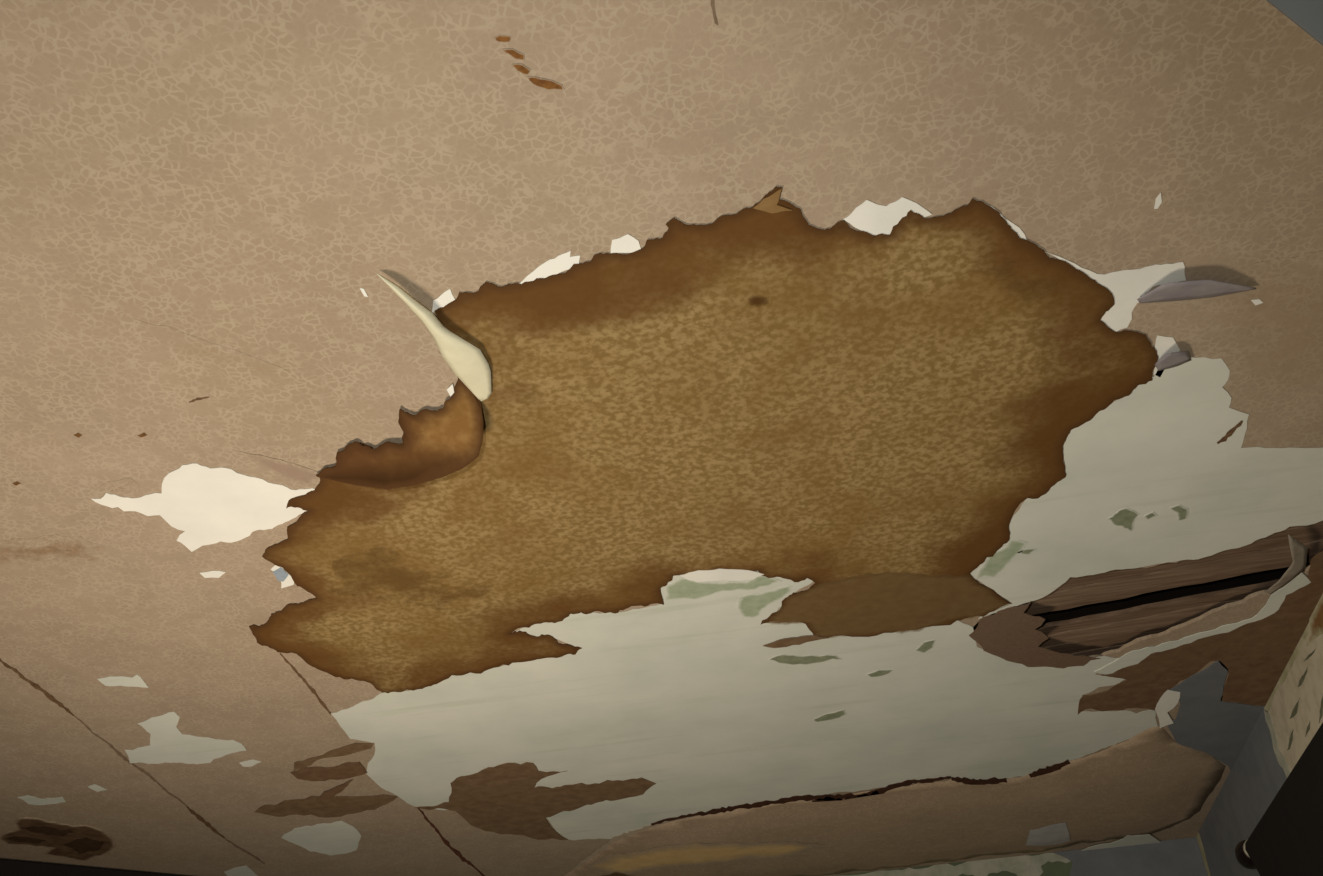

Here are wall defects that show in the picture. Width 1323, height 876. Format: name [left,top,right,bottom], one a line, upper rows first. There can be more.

corrosion [493,35,565,91]
peeling [432,289,455,313]
water stain [249,187,1158,693]
peeling [91,463,315,552]
peeling [271,565,294,588]
peeling [331,335,1323,876]
peeling [98,675,149,688]
crack [280,653,331,715]
crack [0,659,265,865]
peeling [125,712,261,767]
peeling [281,821,361,856]
crack [417,808,485,876]